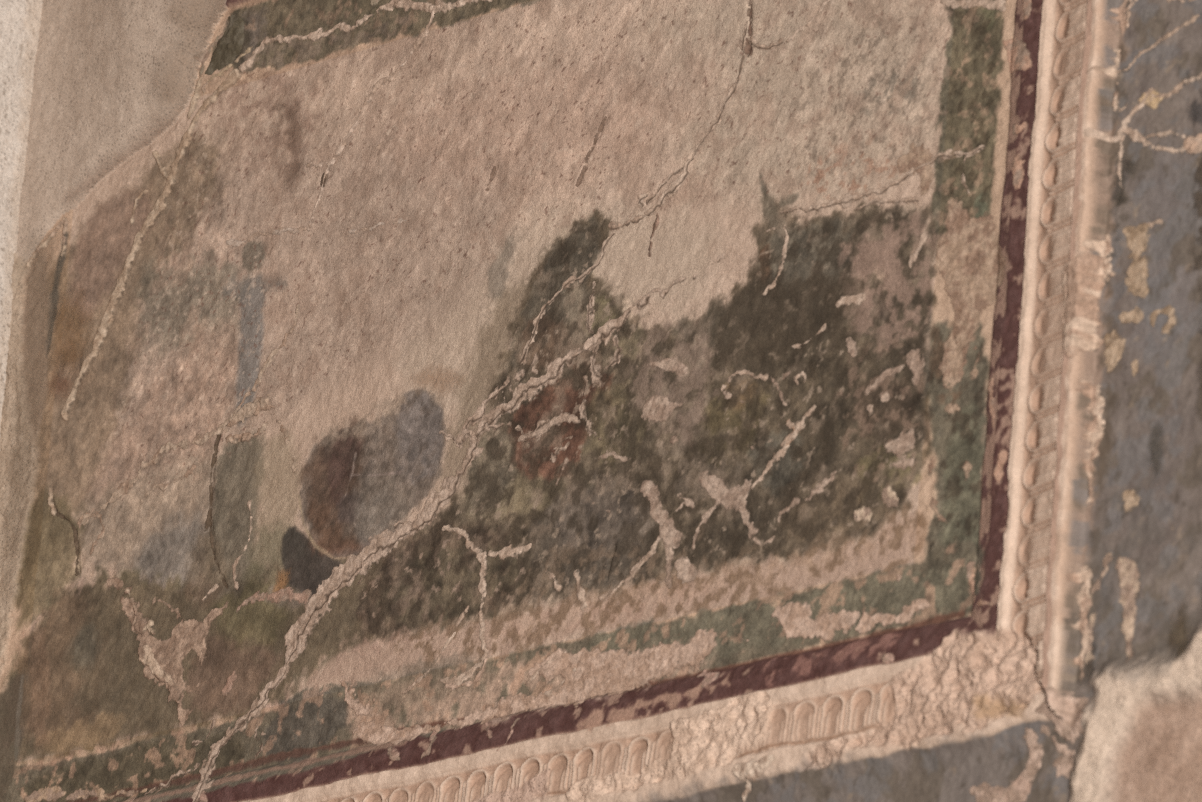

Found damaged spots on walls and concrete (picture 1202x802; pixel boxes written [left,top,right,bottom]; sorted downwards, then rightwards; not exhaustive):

crack [940,0,1006,11]
crack [61,0,492,421]
crack [762,145,984,295]
peeling [1012,154,1025,189]
crack [47,304,299,601]
crack [144,0,830,802]
crack [721,292,866,489]
peeling [1062,223,1176,504]
peeling [341,628,719,761]
peeling [771,598,930,641]
spalling [801,627,1089,802]
peeling [1067,553,1141,678]